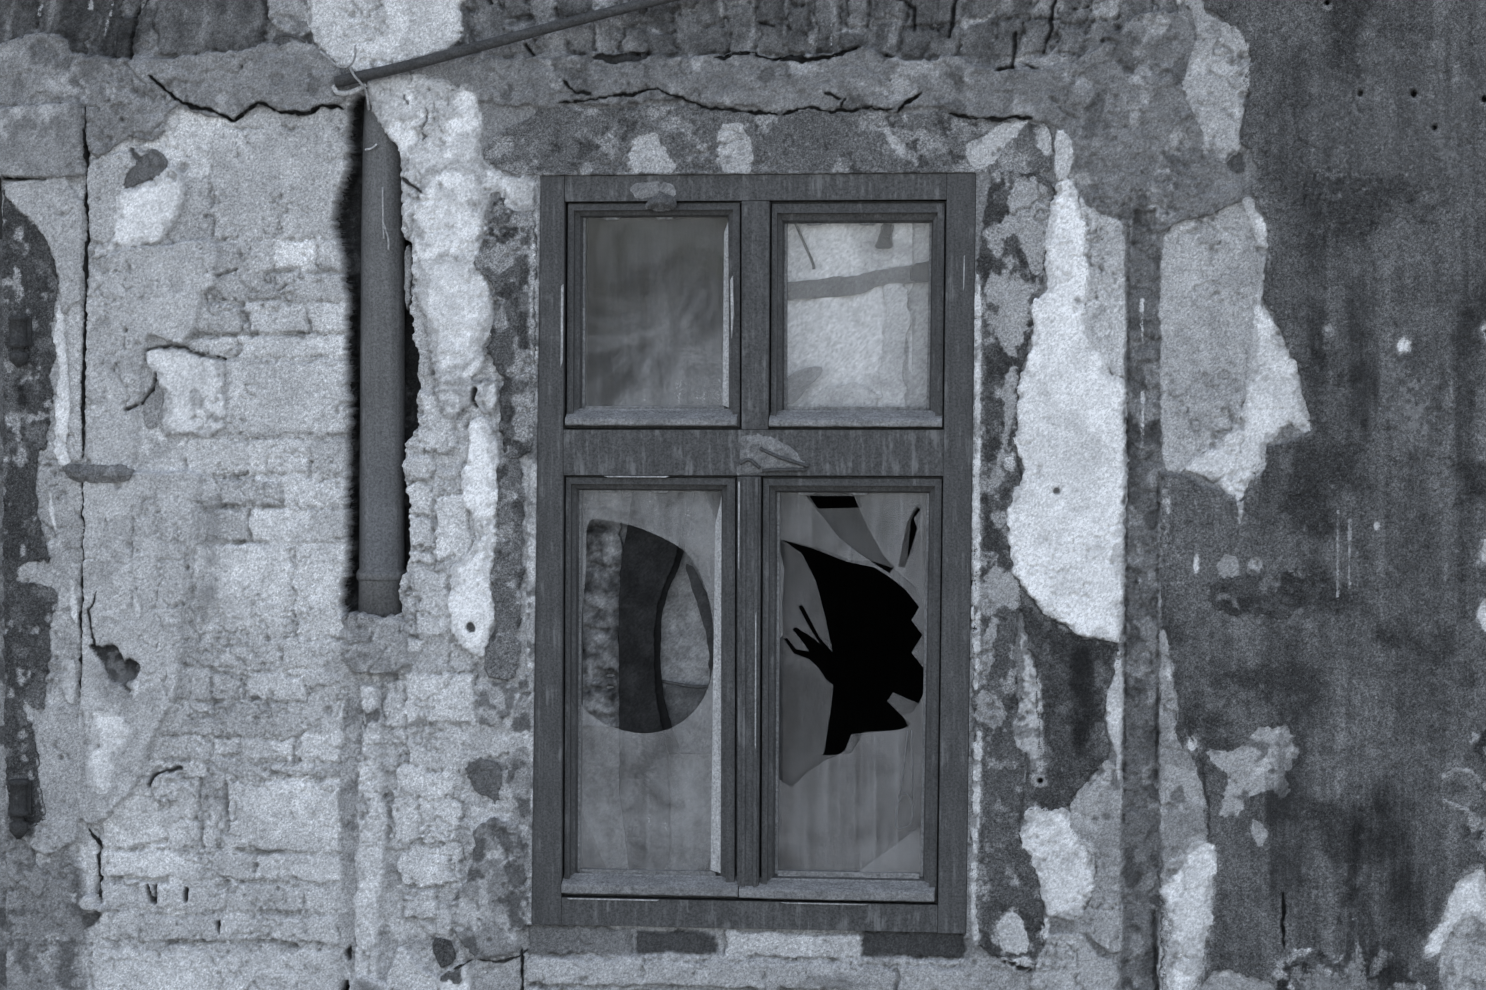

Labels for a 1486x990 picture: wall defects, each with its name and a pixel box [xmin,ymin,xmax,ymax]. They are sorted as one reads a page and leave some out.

crack [149,75,344,122]
crack [559,47,1033,122]
damp [1285,44,1485,207]
peeling [92,149,186,258]
peeling [143,347,226,438]
spalling [1158,197,1313,524]
damp [1348,293,1438,455]
peeling [1193,554,1306,623]
damp [1336,510,1352,597]
spalling [91,644,141,697]
peeling [1158,628,1486,990]
crack [88,828,104,897]